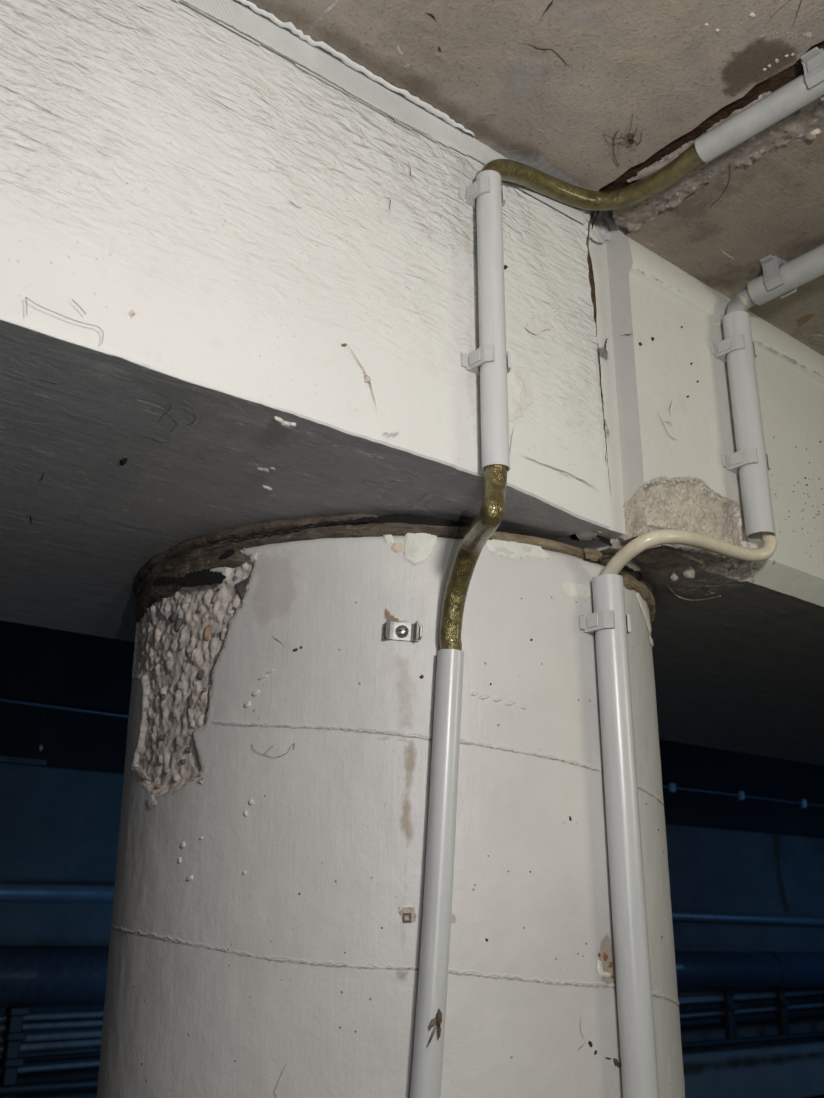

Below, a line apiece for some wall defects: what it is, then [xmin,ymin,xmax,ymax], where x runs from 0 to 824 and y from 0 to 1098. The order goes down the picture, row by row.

damp [723,31,812,94]
spalling [612,96,824,235]
crack [164,516,378,564]
spalling [599,476,751,560]
spalling [626,544,775,596]
spalling [131,548,258,810]